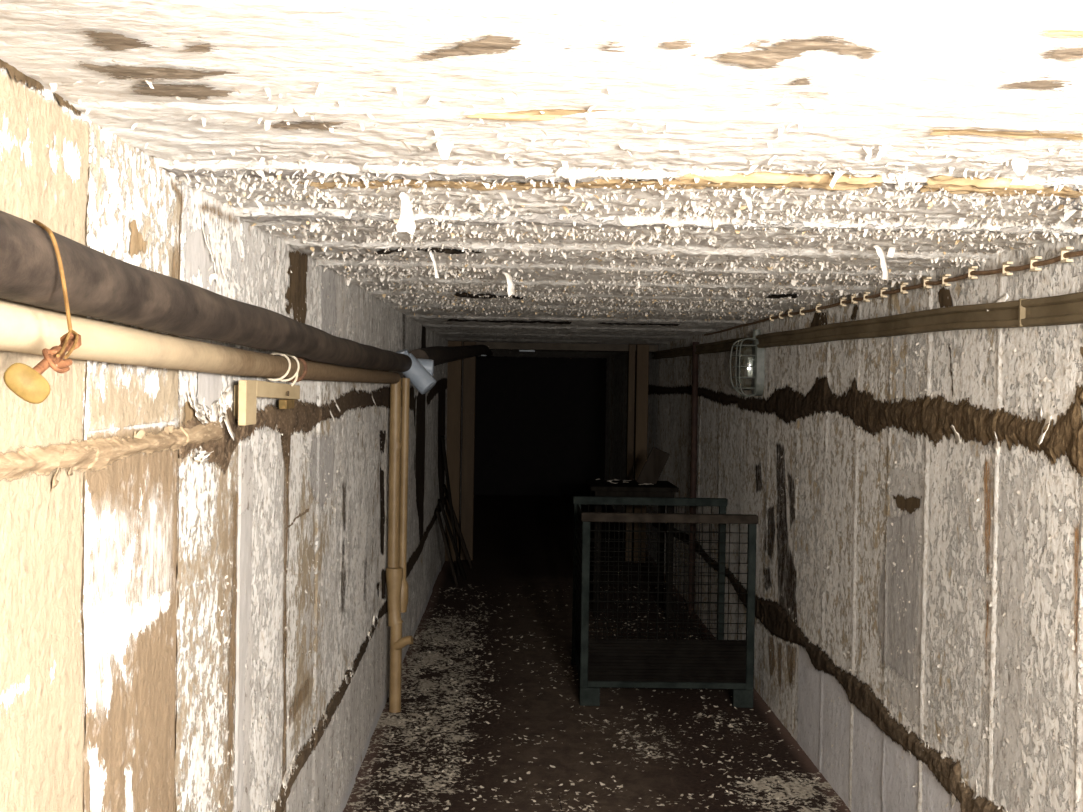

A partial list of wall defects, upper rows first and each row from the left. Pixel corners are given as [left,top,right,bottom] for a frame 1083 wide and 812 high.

peeling [415,35,524,61]
peeling [658,35,885,69]
peeling [1002,75,1074,91]
peeling [1043,29,1083,61]
peeling [169,88,1083,352]
crack [946,343,954,397]
crack [285,482,309,615]
peeling [79,480,196,719]
peeling [177,372,834,812]
crack [282,658,290,765]
peeling [86,739,107,812]
peeling [124,765,135,812]